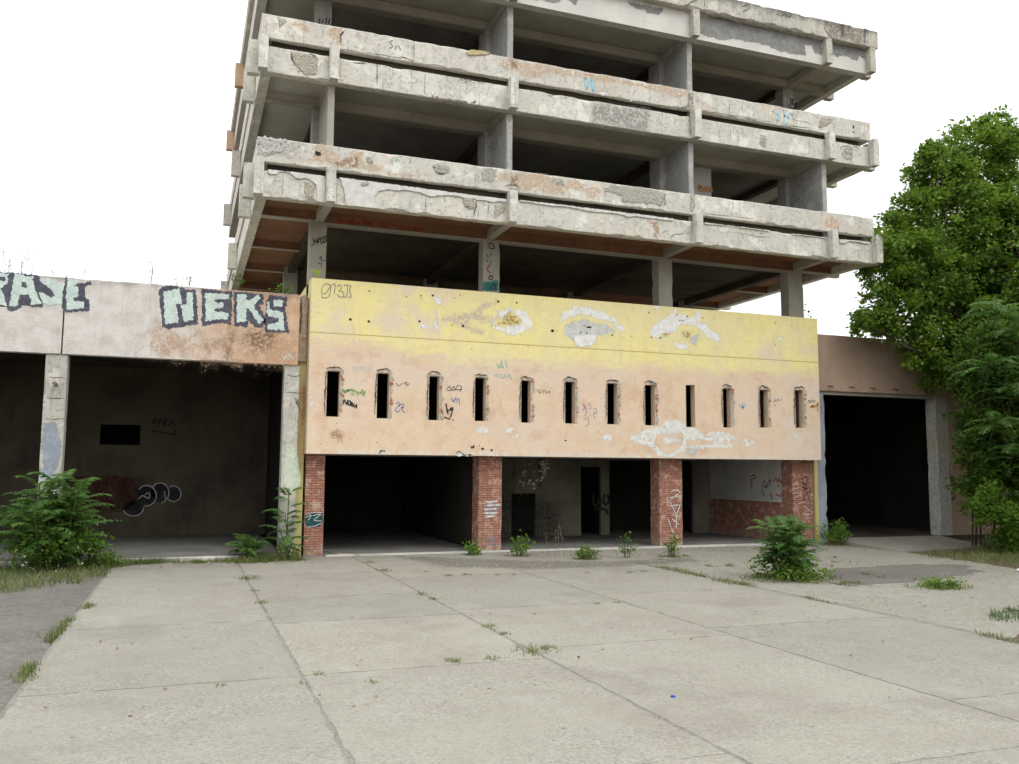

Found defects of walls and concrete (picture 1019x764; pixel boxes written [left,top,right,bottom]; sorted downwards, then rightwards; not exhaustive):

spalling [291,52,318,76]
peeling [256,136,507,218]
spalling [481,168,674,223]
water stain [133,322,309,376]
peeling [488,306,532,336]
peeling [558,306,625,347]
peeling [649,306,720,350]
peeling [630,380,754,458]